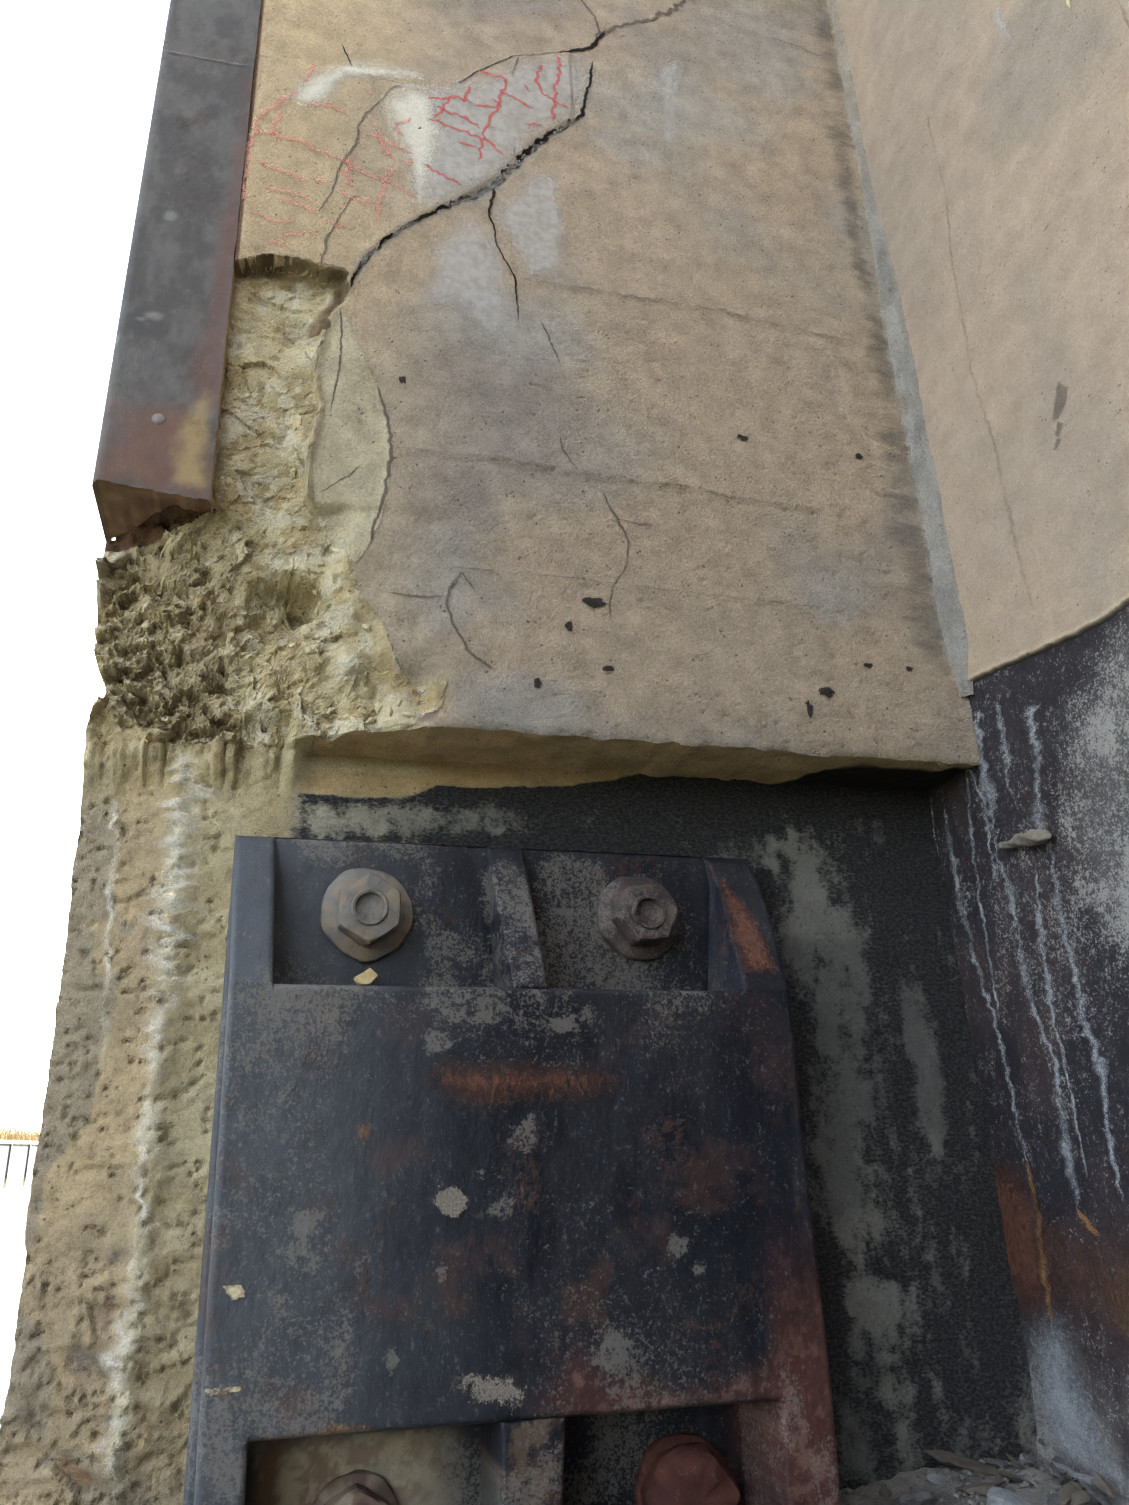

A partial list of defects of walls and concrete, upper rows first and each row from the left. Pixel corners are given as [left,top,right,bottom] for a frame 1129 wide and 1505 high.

crack [316,0,686,408]
spalling [103,253,447,748]
crack [321,387,393,541]
rust [722,885,772,970]
rust [443,1071,587,1094]
rust [994,1161,1052,1318]
rust [1077,1209,1099,1235]
efflorescence [1036,1332,1114,1484]